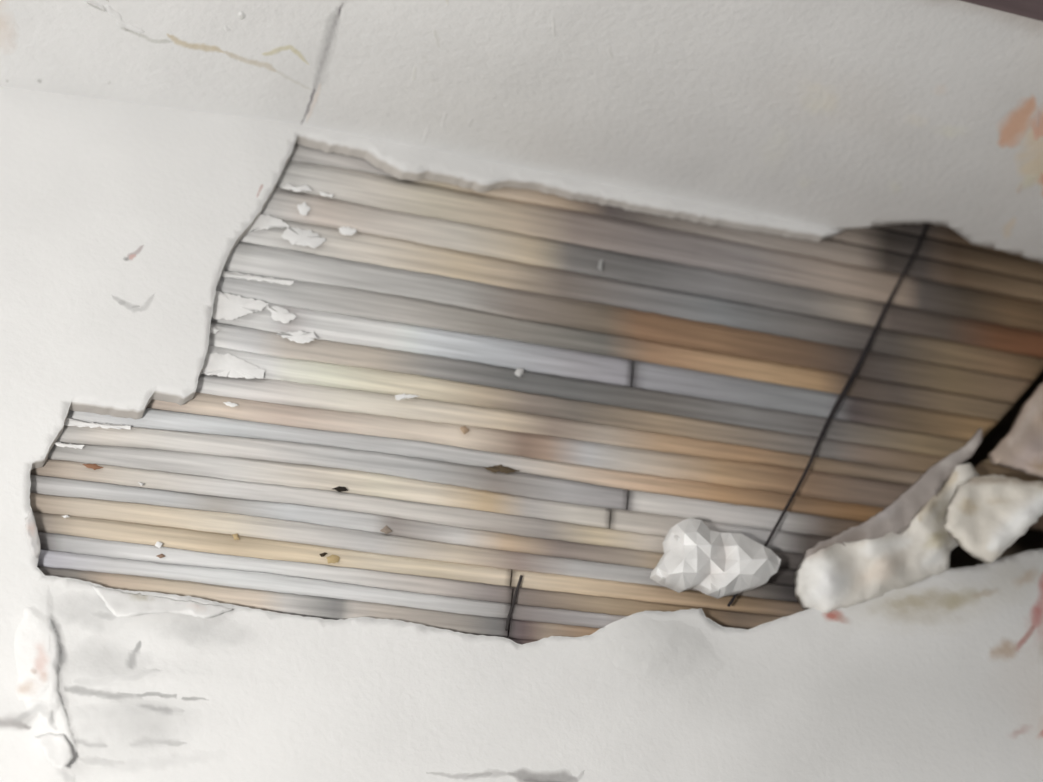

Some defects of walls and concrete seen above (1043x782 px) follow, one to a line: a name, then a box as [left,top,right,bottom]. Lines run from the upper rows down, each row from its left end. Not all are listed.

crack [85,0,351,125]
rust [995,94,1043,198]
spalling [25,134,824,645]
rust [983,571,1043,664]
crack [0,613,209,768]
crack [425,767,585,782]